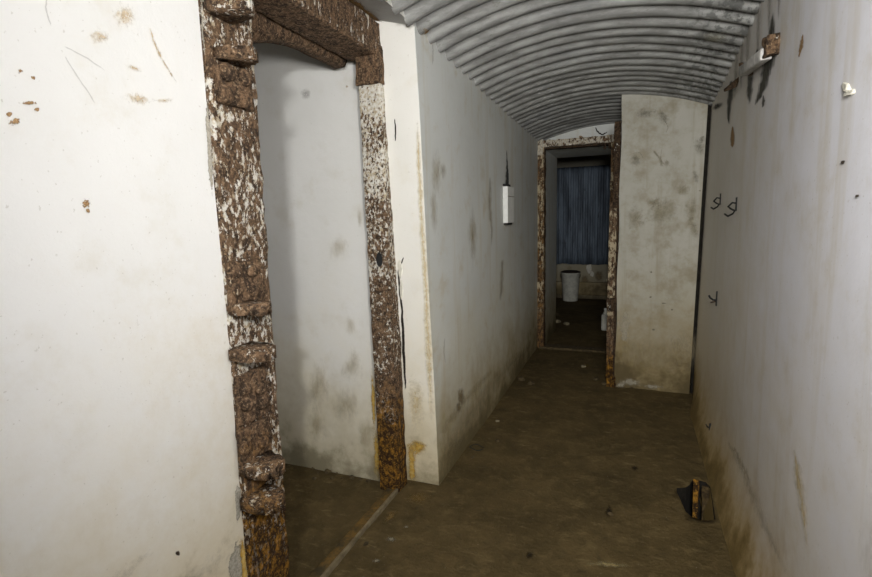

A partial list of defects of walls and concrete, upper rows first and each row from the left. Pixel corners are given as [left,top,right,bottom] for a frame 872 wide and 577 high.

corrosion [348,0,382,22]
corrosion [409,442,424,479]